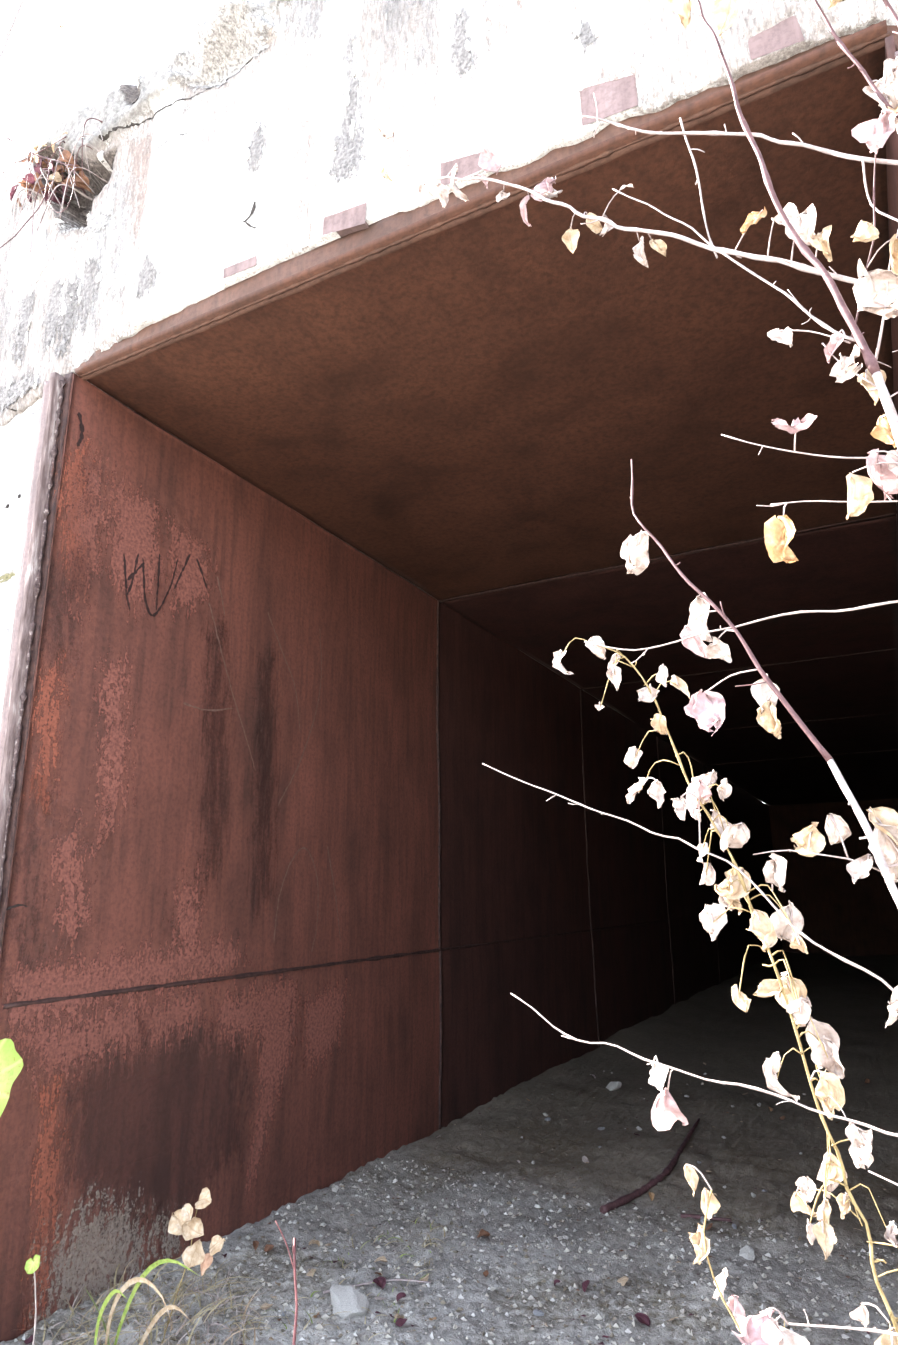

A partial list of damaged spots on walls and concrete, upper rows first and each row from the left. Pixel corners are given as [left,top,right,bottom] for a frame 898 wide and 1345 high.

spalling [33,143,117,237]
crack [98,85,222,149]
spalling [164,0,273,92]
peeling [0,253,103,417]
corrosion [52,435,98,583]
corrosion [22,636,75,824]
corrosion [10,1072,76,1334]